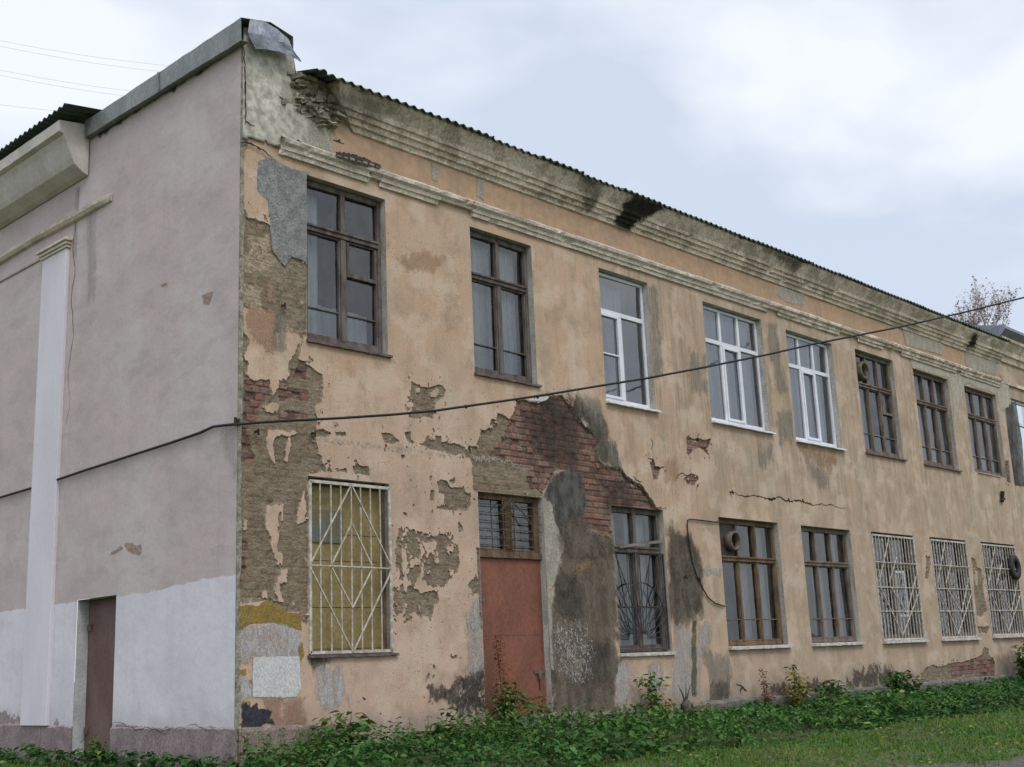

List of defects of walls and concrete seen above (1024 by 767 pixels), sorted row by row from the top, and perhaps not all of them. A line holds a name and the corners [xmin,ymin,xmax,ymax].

spalling [279,71,347,130]
leakage [615,196,664,231]
flaking render [240,210,369,625]
flaking render [381,376,667,542]
flaking render [681,475,698,490]
flaking render [686,434,712,459]
crack [729,491,845,509]
flaking render [392,504,482,634]
leakage [550,513,621,714]
leakage [668,526,732,704]
peeling [551,617,596,684]
flaking render [921,648,996,682]